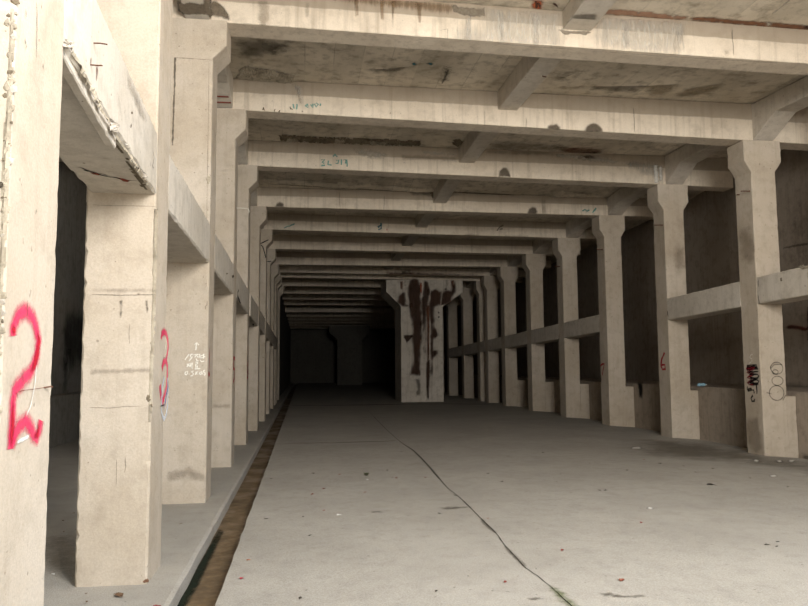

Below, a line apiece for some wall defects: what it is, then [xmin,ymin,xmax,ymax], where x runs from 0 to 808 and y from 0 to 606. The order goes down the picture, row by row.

corrosion [606,10,808,30]
spalling [63,39,153,190]
corrosion [397,279,455,398]
crack [370,417,572,606]